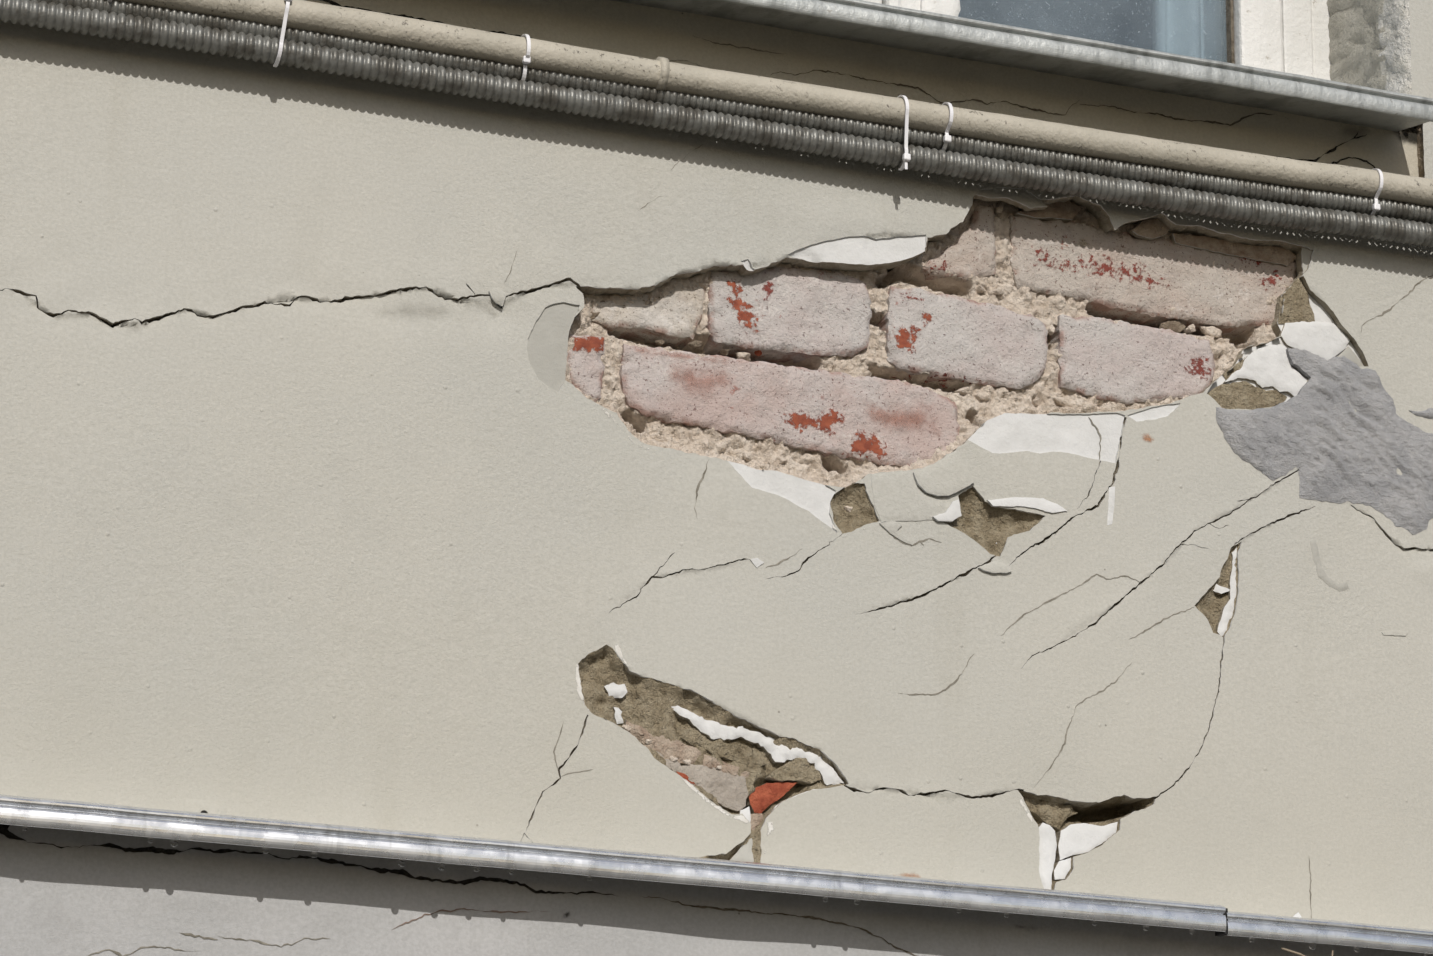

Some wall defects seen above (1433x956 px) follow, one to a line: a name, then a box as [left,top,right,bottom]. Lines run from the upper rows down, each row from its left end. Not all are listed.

crack [0,251,582,328]
flaking render [527,187,1368,574]
crack [609,534,842,613]
crack [855,417,1127,615]
crack [899,471,1315,695]
flaking render [1195,542,1241,638]
crack [1351,505,1433,551]
crack [27,842,917,956]
crack [520,715,593,843]
flaking render [575,644,849,863]
crack [844,608,1191,799]
flaking render [1016,789,1156,890]